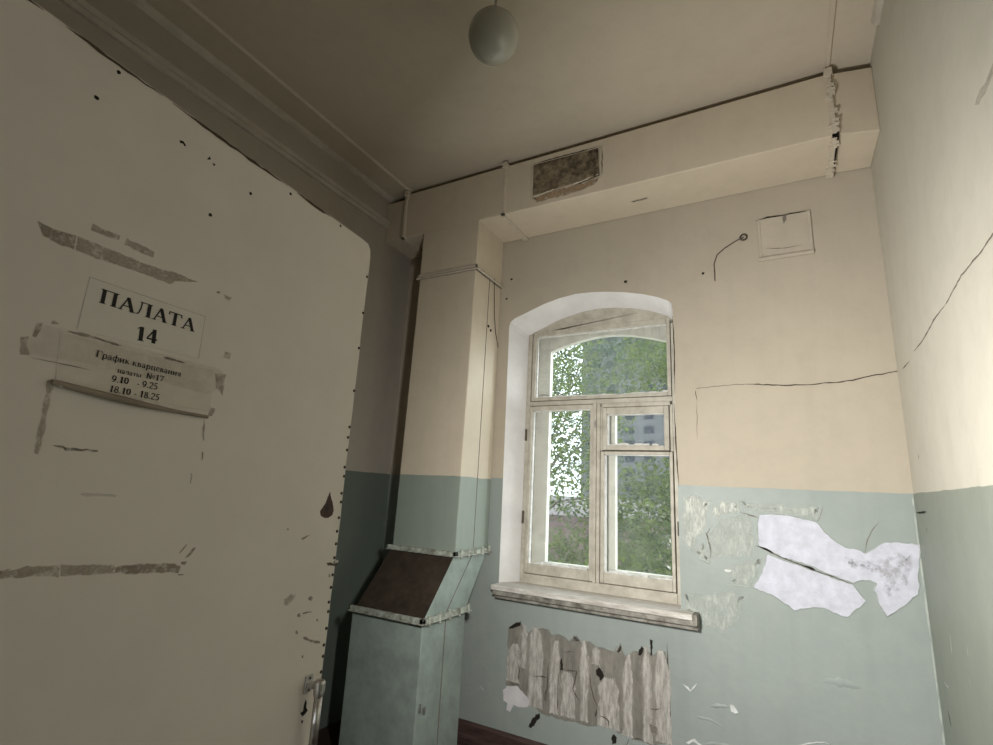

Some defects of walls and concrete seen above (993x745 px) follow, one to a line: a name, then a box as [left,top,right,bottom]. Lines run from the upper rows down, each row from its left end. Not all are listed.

crack [672,233,993,483]
peeling [736,497,945,745]